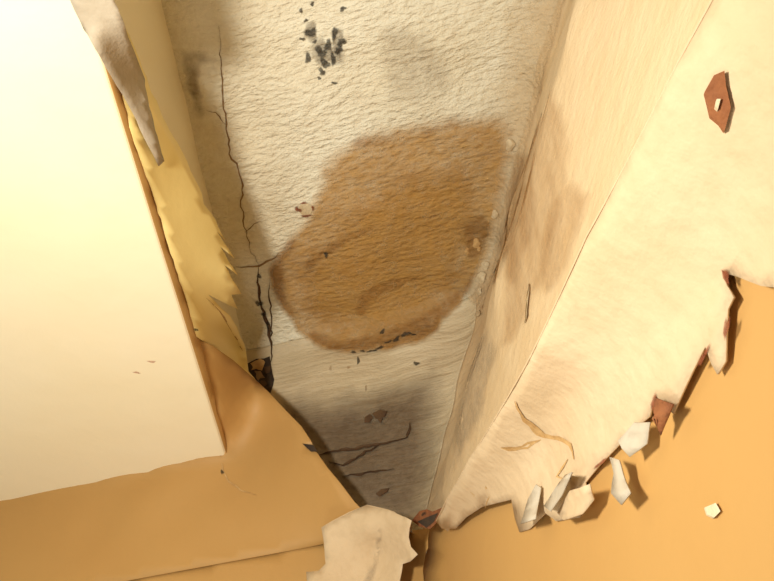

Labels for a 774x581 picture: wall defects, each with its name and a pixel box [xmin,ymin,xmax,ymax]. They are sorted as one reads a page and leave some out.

crack [209,26,282,360]
spalling [248,356,274,393]
crack [320,424,411,476]
water stain [273,0,563,364]
peeling [417,0,774,532]
corrosion [704,71,731,133]